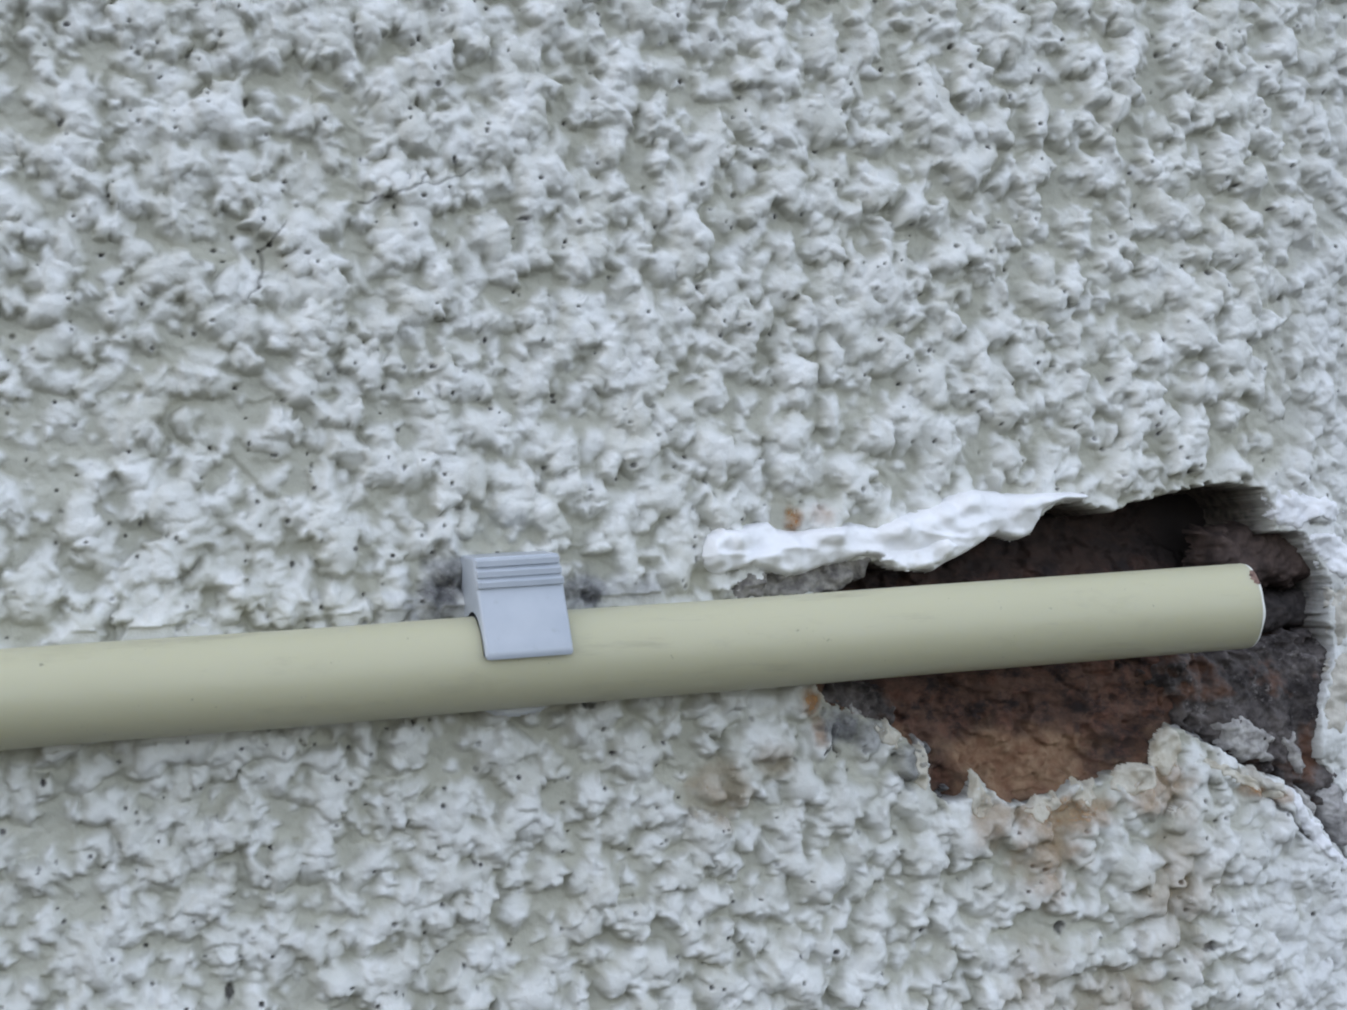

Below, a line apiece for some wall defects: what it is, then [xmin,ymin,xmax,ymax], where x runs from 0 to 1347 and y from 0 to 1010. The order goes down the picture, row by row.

spalling [731,490,1347,870]